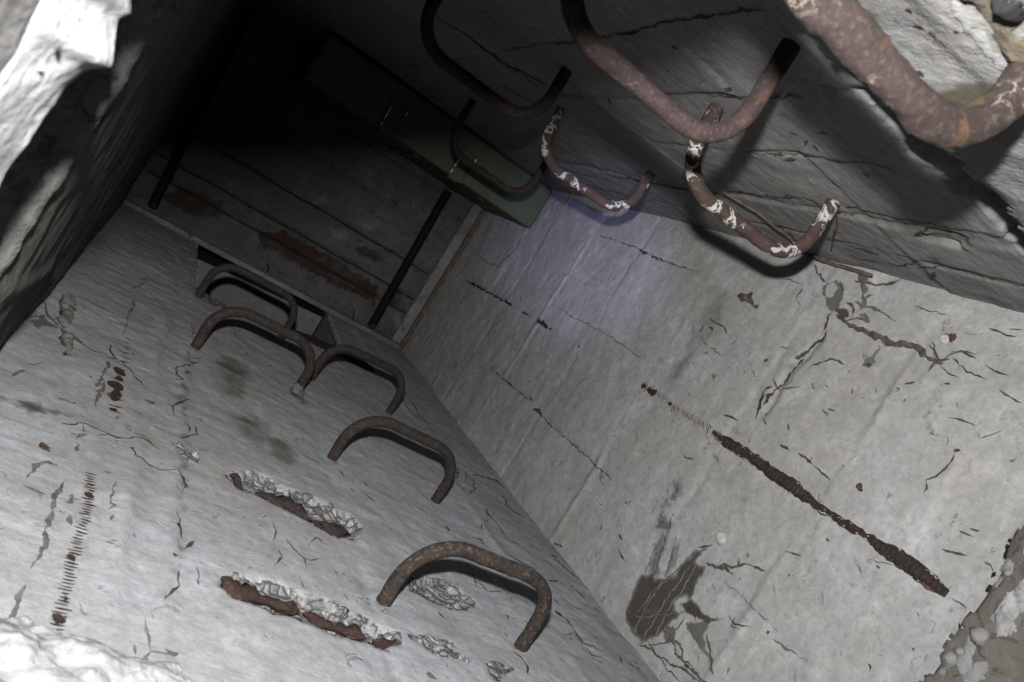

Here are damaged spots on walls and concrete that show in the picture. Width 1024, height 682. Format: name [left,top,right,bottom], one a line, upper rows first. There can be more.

crack [602,8,764,49]
corrosion [259,230,378,300]
crack [558,307,643,359]
crack [989,328,1022,337]
crack [9,283,218,617]
corrosion [107,338,132,413]
crack [491,369,630,505]
crack [723,330,871,480]
spalling [224,470,363,540]
corrosion [50,472,96,630]
spalling [219,572,515,682]